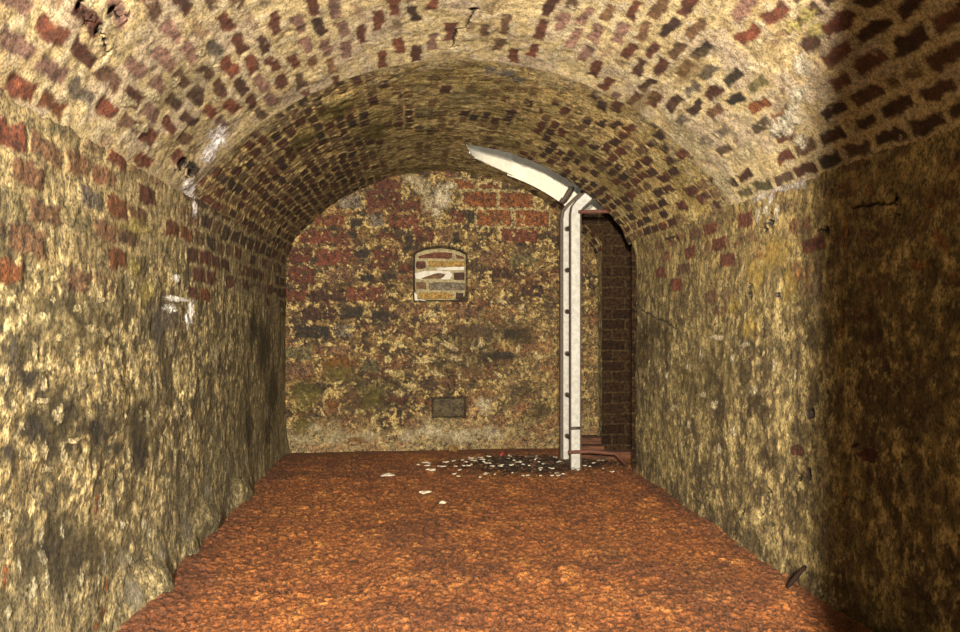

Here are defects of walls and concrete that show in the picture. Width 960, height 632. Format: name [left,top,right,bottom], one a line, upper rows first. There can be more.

crack [445,8,482,47]
damp [201,125,227,162]
damp [182,179,198,214]
crack [851,192,906,218]
damp [129,257,194,356]